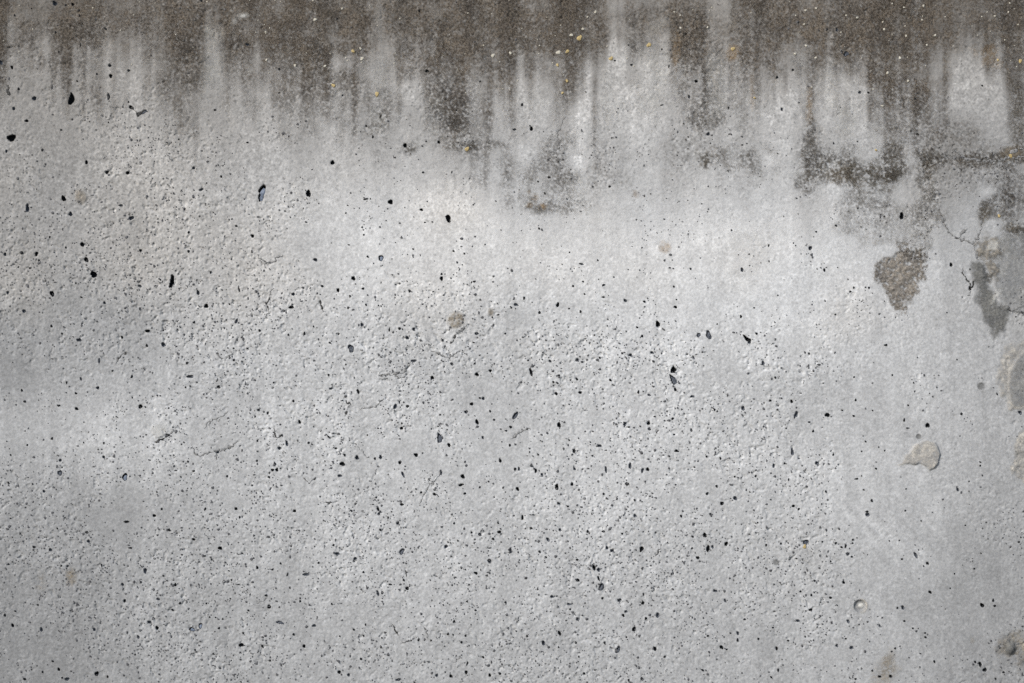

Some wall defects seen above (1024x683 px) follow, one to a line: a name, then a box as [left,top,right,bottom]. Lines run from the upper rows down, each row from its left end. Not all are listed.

leakage [0,0,610,155]
leakage [624,0,1024,175]
leakage [799,140,898,192]
spalling [875,243,928,310]